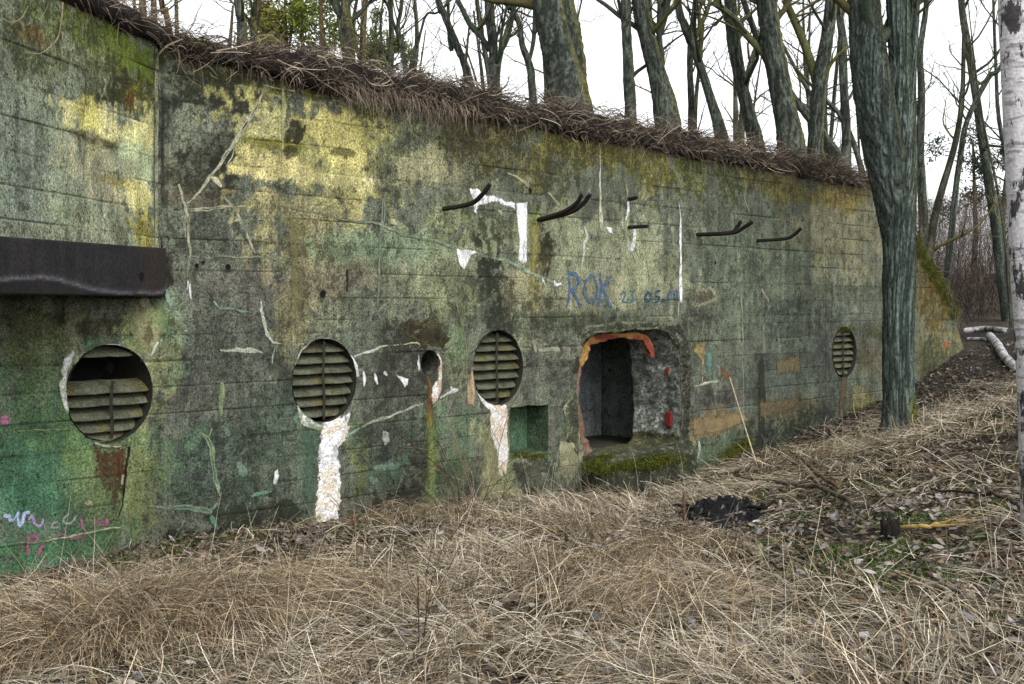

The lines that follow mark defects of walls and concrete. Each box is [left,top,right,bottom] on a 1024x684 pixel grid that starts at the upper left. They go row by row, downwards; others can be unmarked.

crack [161,85,304,364]
water stain [59,306,92,413]
rust [94,445,126,504]
water stain [297,405,351,524]
water stain [478,394,524,502]
spalling [508,320,741,499]